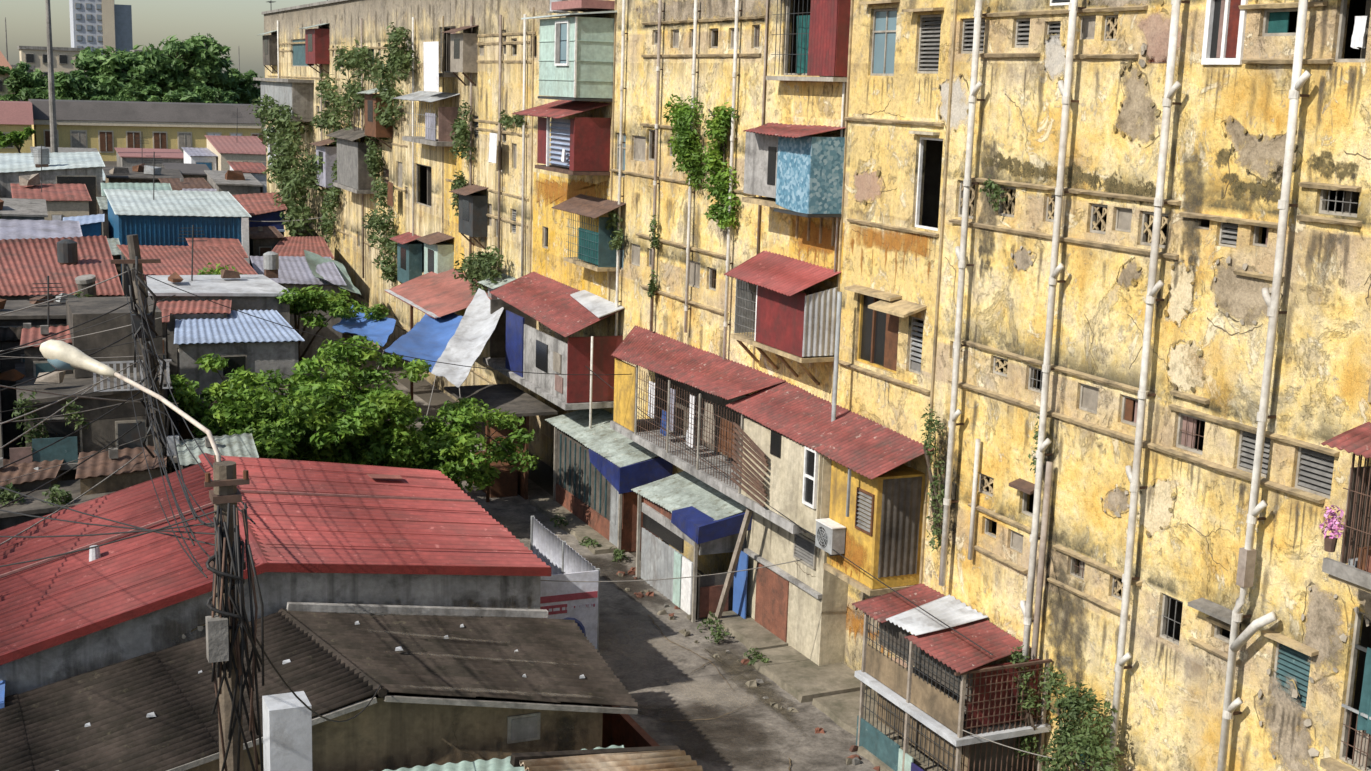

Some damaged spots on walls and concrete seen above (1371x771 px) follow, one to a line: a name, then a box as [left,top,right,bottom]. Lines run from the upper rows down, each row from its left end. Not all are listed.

flaking render [938,74,969,131]
flaking render [1043,34,1066,84]
flaking render [1087,0,1182,149]
flaking render [1221,116,1304,187]
flaking render [854,169,886,205]
leakage [978,142,1156,275]
rust [792,220,930,277]
flaking render [1211,256,1283,325]
flaking render [1164,260,1206,393]
flaking render [1100,478,1179,537]